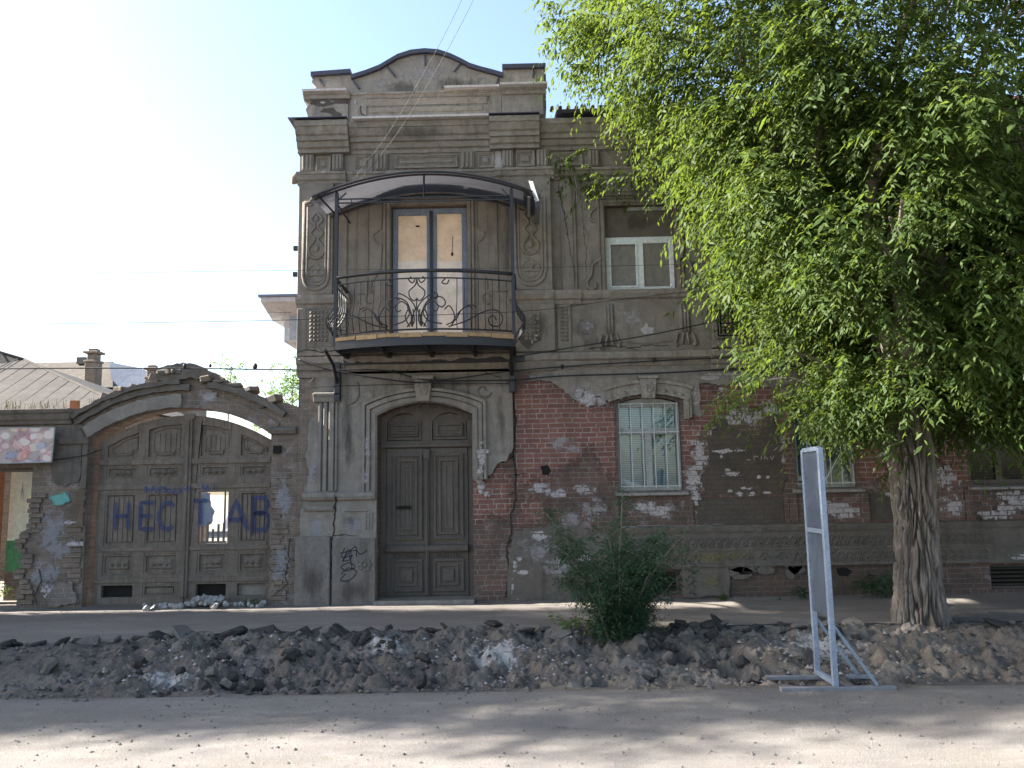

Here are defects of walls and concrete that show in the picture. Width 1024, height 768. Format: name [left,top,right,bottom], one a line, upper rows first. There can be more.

crack [331,499,356,603]
crack [505,393,527,598]
spalling [473,380,617,602]
peeling [681,382,791,497]
spalling [729,566,809,597]
spalling [831,565,893,596]